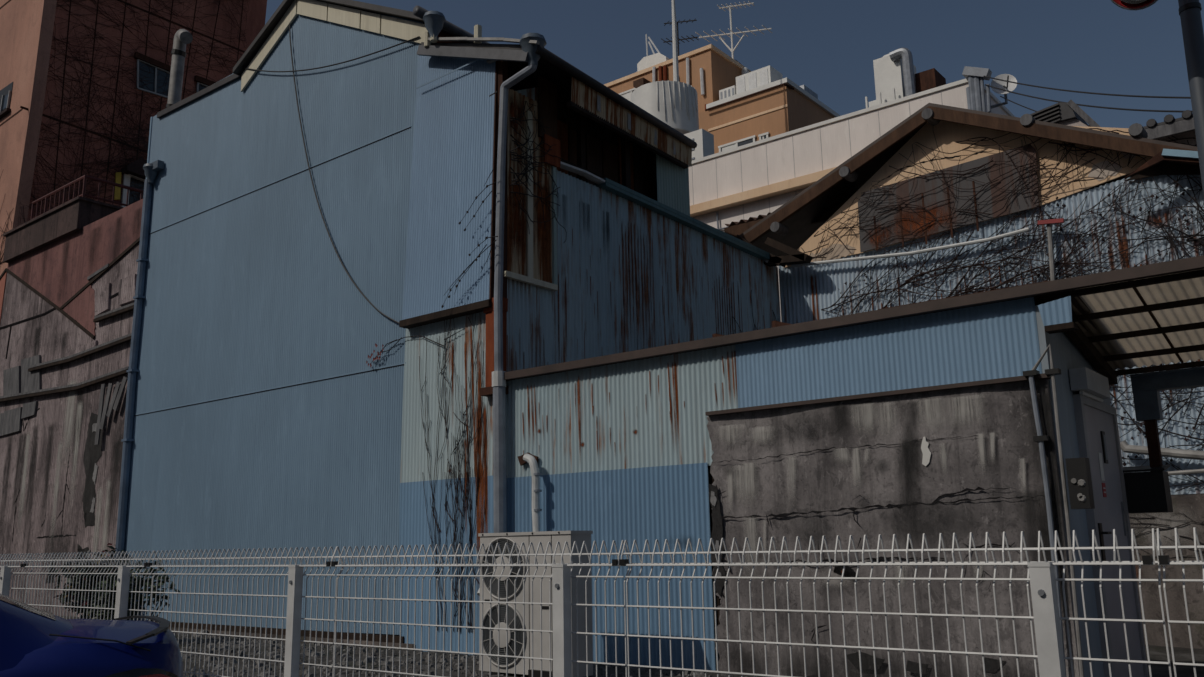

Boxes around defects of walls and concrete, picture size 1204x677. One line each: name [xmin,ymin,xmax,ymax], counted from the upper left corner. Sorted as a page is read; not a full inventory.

spalling [82,413,103,528]
rust [448,327,488,559]
rust [522,385,547,468]
rust [575,376,615,450]
rust [645,363,685,431]
rust [714,351,738,403]
water stain [837,448,882,479]
water stain [835,403,892,427]
crack [711,435,1044,589]
water stain [902,399,949,533]
water stain [978,433,994,462]
water stain [1021,394,1061,561]